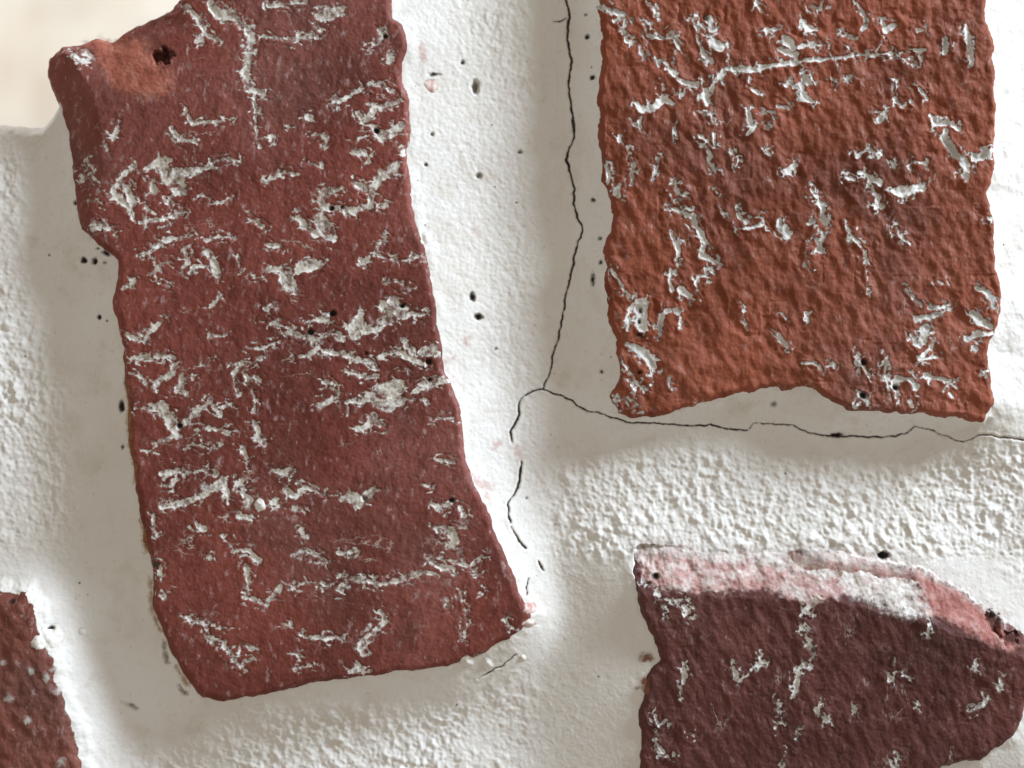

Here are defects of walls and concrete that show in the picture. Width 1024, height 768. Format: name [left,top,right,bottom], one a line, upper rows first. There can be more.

crack [507,0,1024,595]